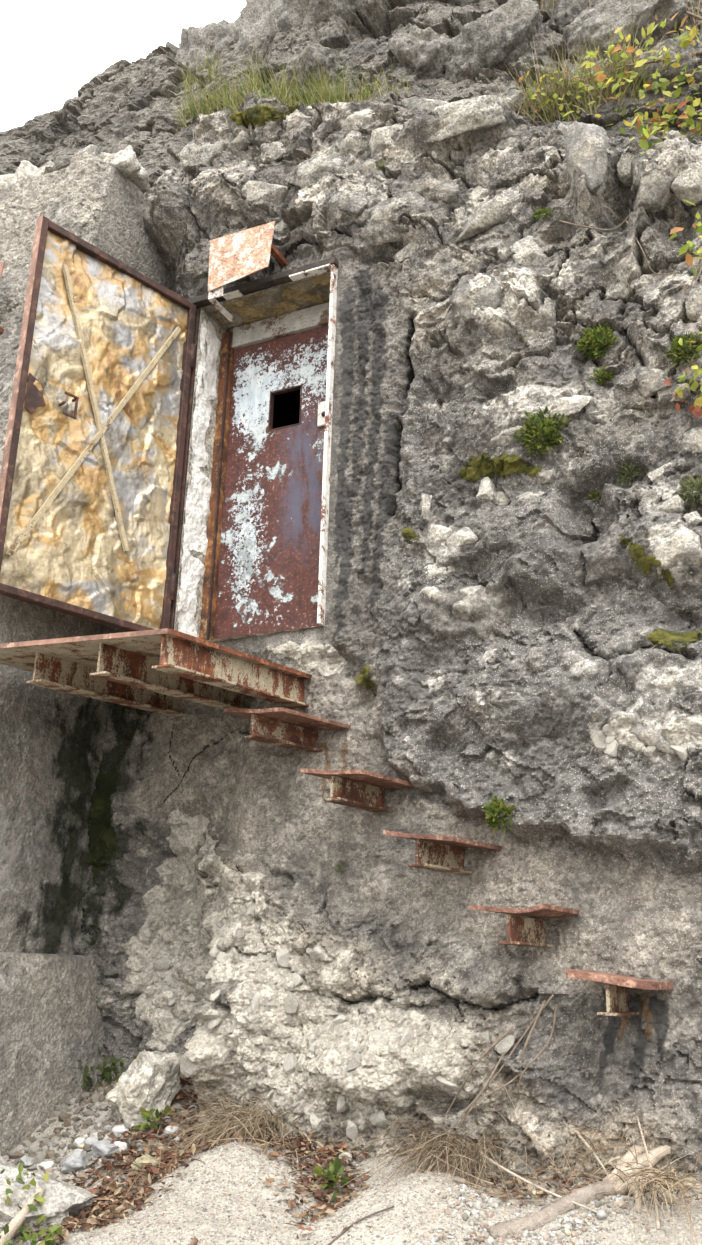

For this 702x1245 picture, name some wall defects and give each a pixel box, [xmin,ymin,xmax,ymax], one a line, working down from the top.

peeling [178,319,293,637]
peeling [276,350,327,393]
leakage [17,698,153,983]
crack [337,982,539,1033]